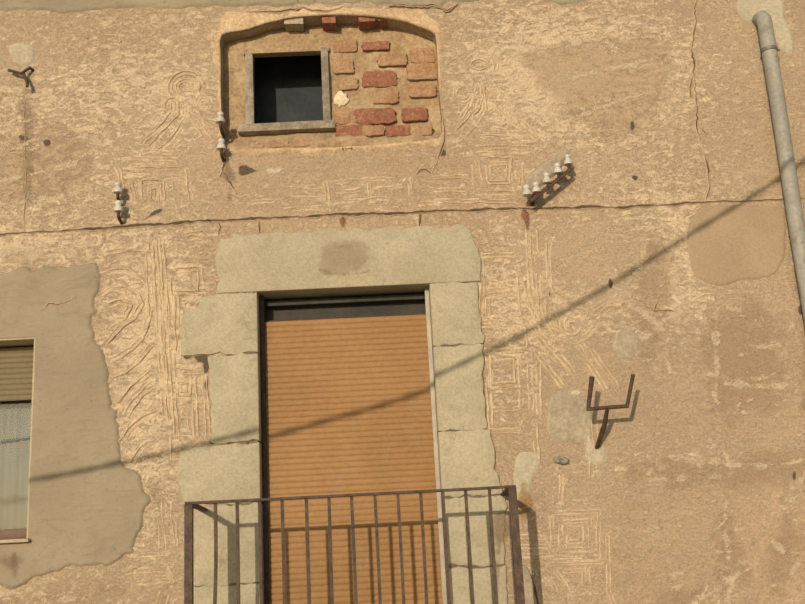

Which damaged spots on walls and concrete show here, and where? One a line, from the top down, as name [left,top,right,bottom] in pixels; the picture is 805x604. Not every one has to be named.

crack [0,0,805,237]